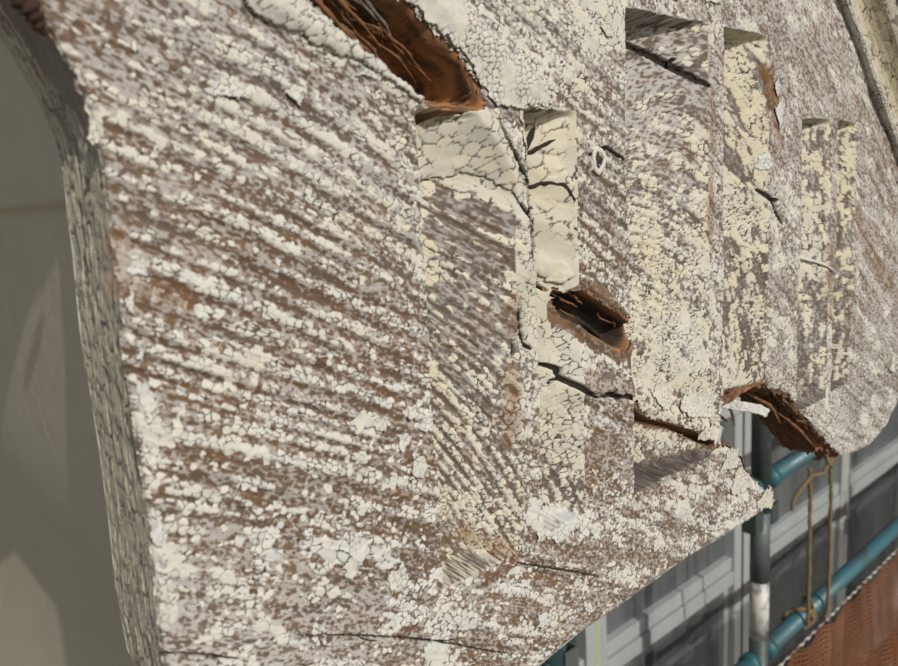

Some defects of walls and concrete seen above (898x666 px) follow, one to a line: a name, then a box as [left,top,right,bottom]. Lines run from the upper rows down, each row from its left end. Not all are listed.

crack [625,43,710,87]
peeling [775,77,785,129]
peeling [87,115,100,145]
spalling [243,0,577,284]
crack [510,311,633,400]
peeling [348,404,433,479]
spalling [632,373,841,512]
peeling [536,502,578,544]
peeling [342,532,373,580]
peeling [387,561,409,594]
crack [517,562,596,576]
crack [159,651,239,659]